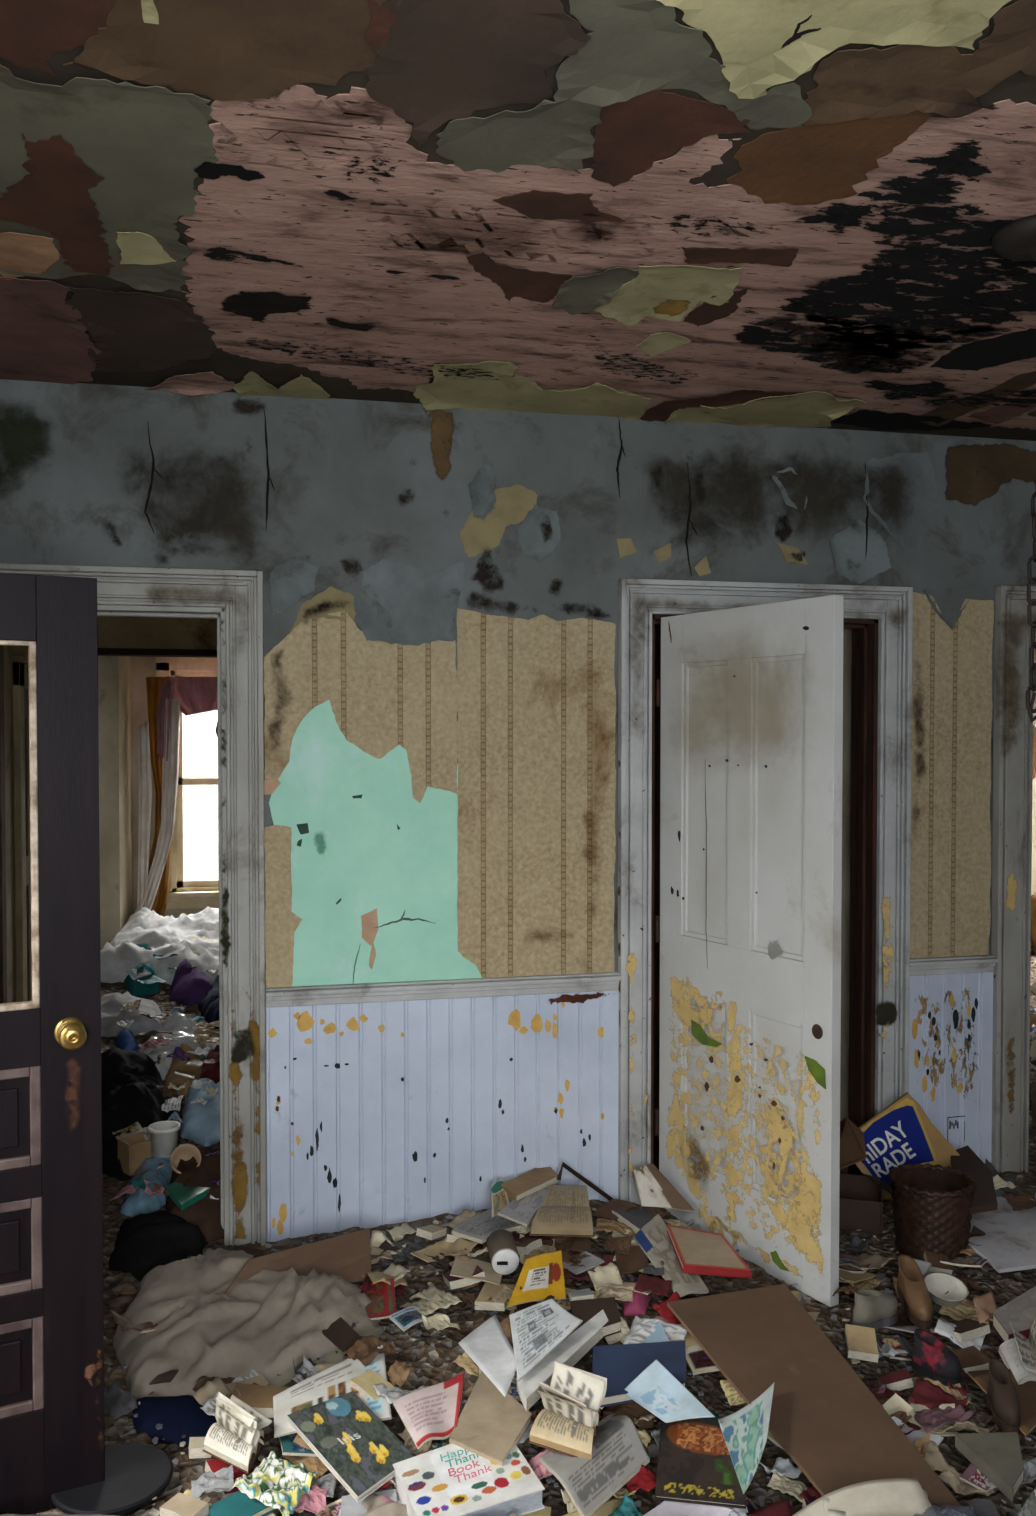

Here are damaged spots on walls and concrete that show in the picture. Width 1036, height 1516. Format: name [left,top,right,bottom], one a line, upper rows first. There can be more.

flaking render [0,0,1036,430]
leakage [733,139,1036,506]
leakage [0,406,49,493]
crack [144,421,163,533]
crack [263,407,275,528]
leakage [425,409,454,479]
leakage [651,453,906,561]
flaking render [264,700,482,986]
leakage [220,861,231,968]
peeling [284,1011,405,1069]
peeling [912,988,980,1102]
peeling [666,977,826,1277]